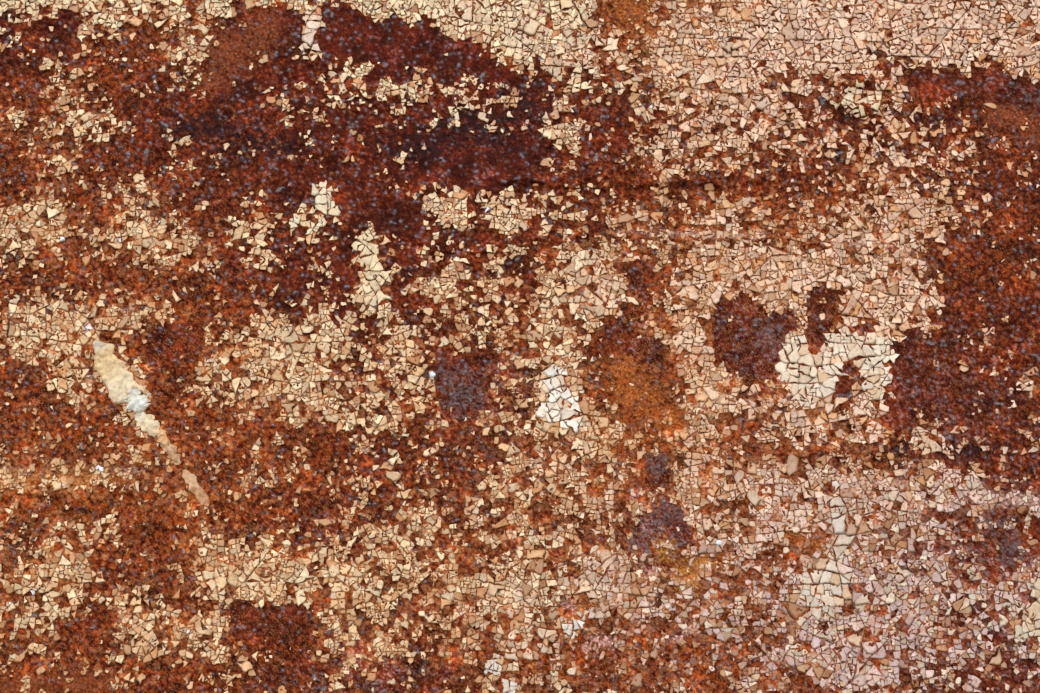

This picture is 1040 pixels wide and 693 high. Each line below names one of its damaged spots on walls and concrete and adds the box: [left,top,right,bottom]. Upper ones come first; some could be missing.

rust [148,2,293,97]
peeling [259,56,523,136]
crack [662,37,769,61]
rust [767,62,836,119]
crack [919,8,970,64]
peeling [224,181,342,281]
crack [6,302,24,349]
peeling [957,315,1039,414]
peeling [0,402,189,506]
rust [347,140,956,693]
crack [0,522,21,546]
rust [0,601,233,693]